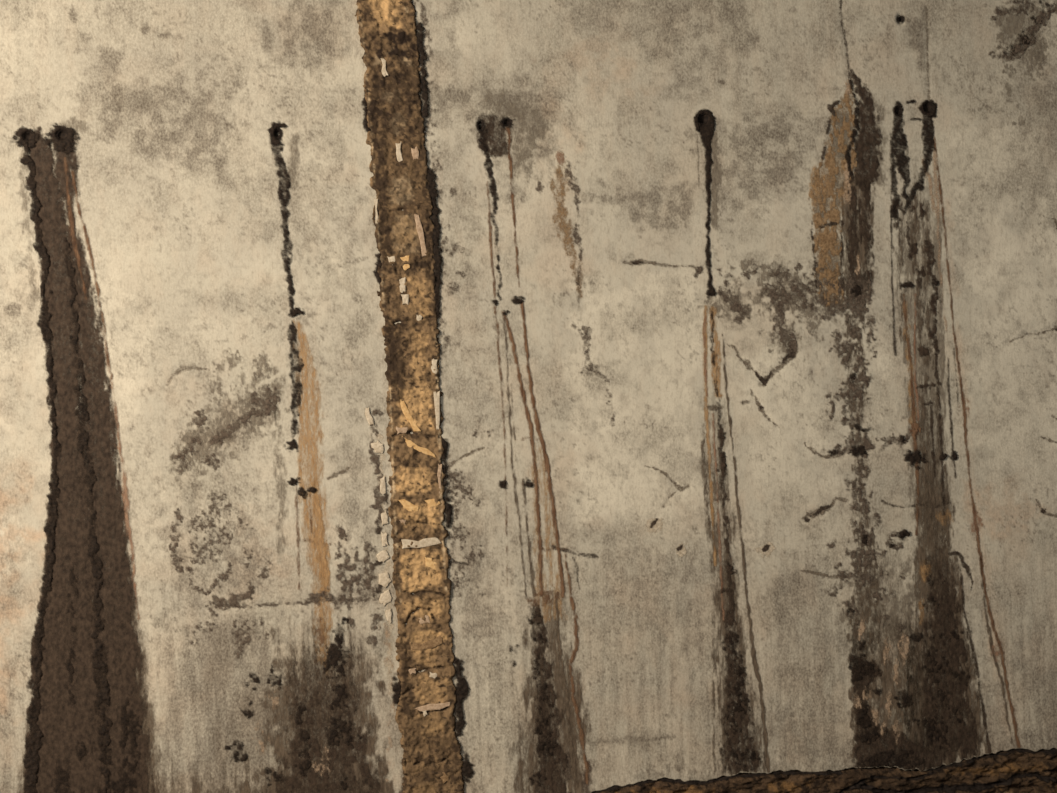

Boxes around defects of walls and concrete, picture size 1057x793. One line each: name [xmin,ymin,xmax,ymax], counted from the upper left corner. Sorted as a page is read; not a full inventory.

water stain [989,0,1057,96]
water stain [12,118,174,793]
water stain [169,122,403,793]
spalling [355,0,474,793]
water stain [448,469,479,506]
water stain [476,91,592,793]
crack [731,342,798,425]
crack [804,442,845,459]
water stain [693,70,1021,775]
water stain [453,509,484,596]
spalling [591,748,1057,793]